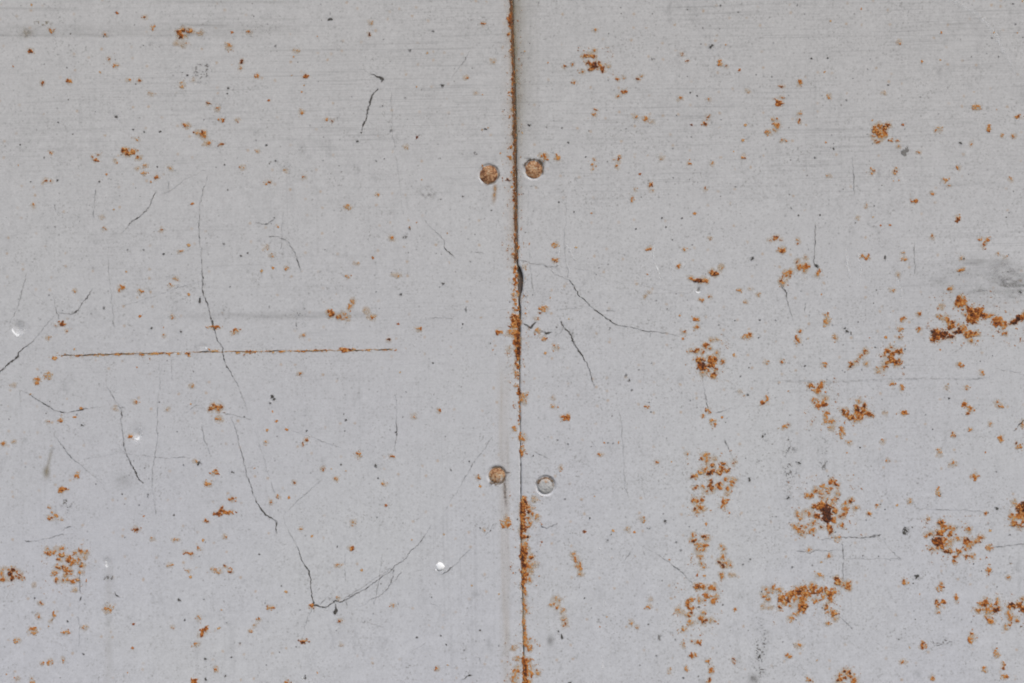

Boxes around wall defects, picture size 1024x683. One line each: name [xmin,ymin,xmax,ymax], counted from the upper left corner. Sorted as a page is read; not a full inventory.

crack [362,74,384,127]
corrosion [492,0,559,457]
crack [524,322,592,379]
corrosion [679,315,735,379]
corrosion [848,287,1024,391]
corrosion [804,377,874,453]
crack [298,540,422,614]
corrosion [500,496,543,683]
corrosion [674,450,737,682]
corrosion [761,553,852,625]
corrosion [788,475,878,552]
corrosion [921,500,1024,576]